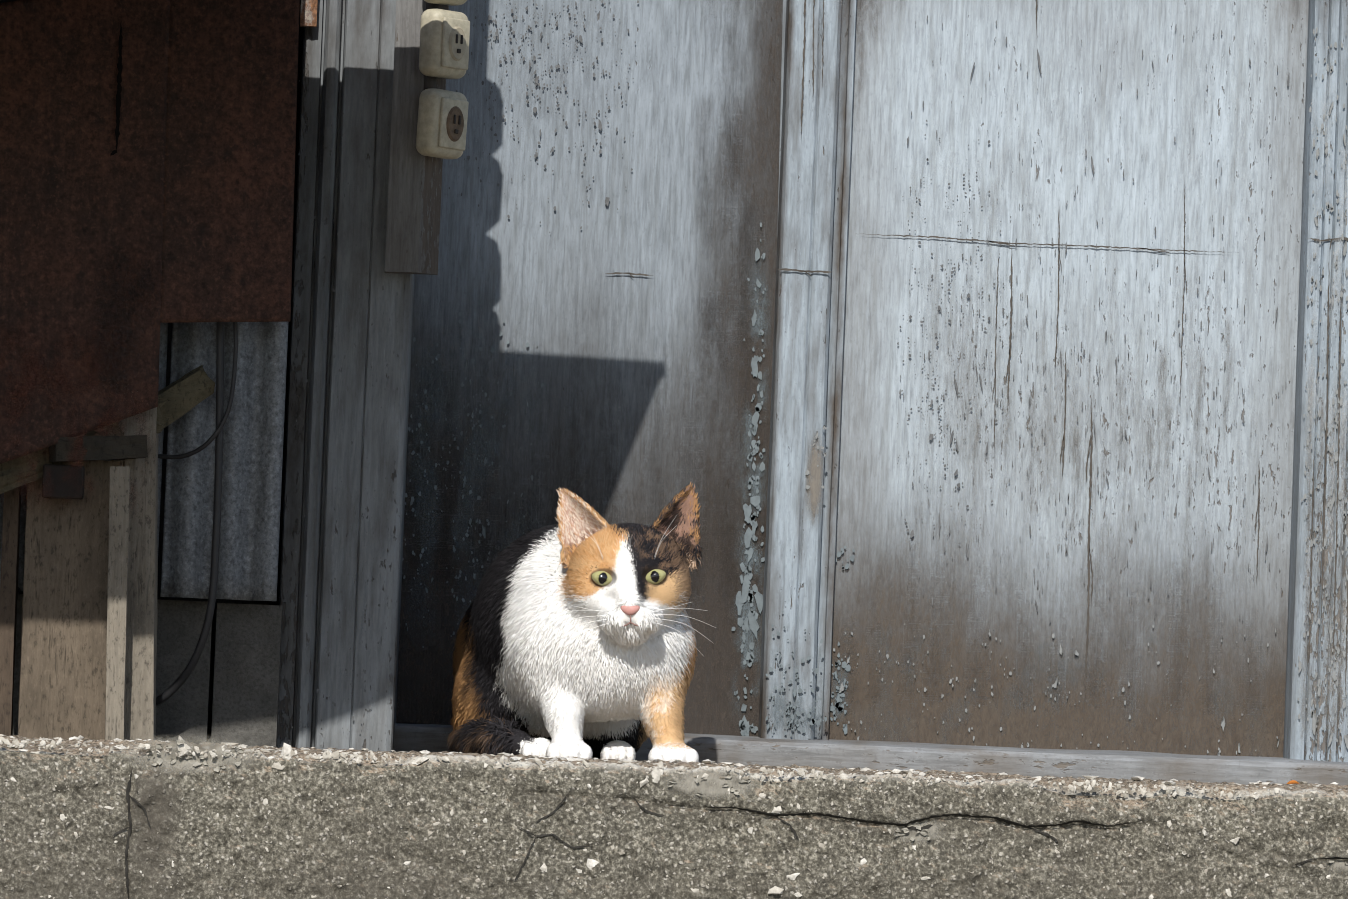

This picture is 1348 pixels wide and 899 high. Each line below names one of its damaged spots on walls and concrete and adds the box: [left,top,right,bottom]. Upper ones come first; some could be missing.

peeling [897,161,1129,564]
peeling [731,278,866,740]
peeling [1009,461,1084,658]
crack [867,189,1239,699]
peeling [1090,430,1184,496]
peeling [868,617,1015,746]
leakage [829,552,1287,758]
crack [514,794,590,882]
crack [635,799,666,817]
crack [709,807,1142,842]
crack [1293,857,1348,866]